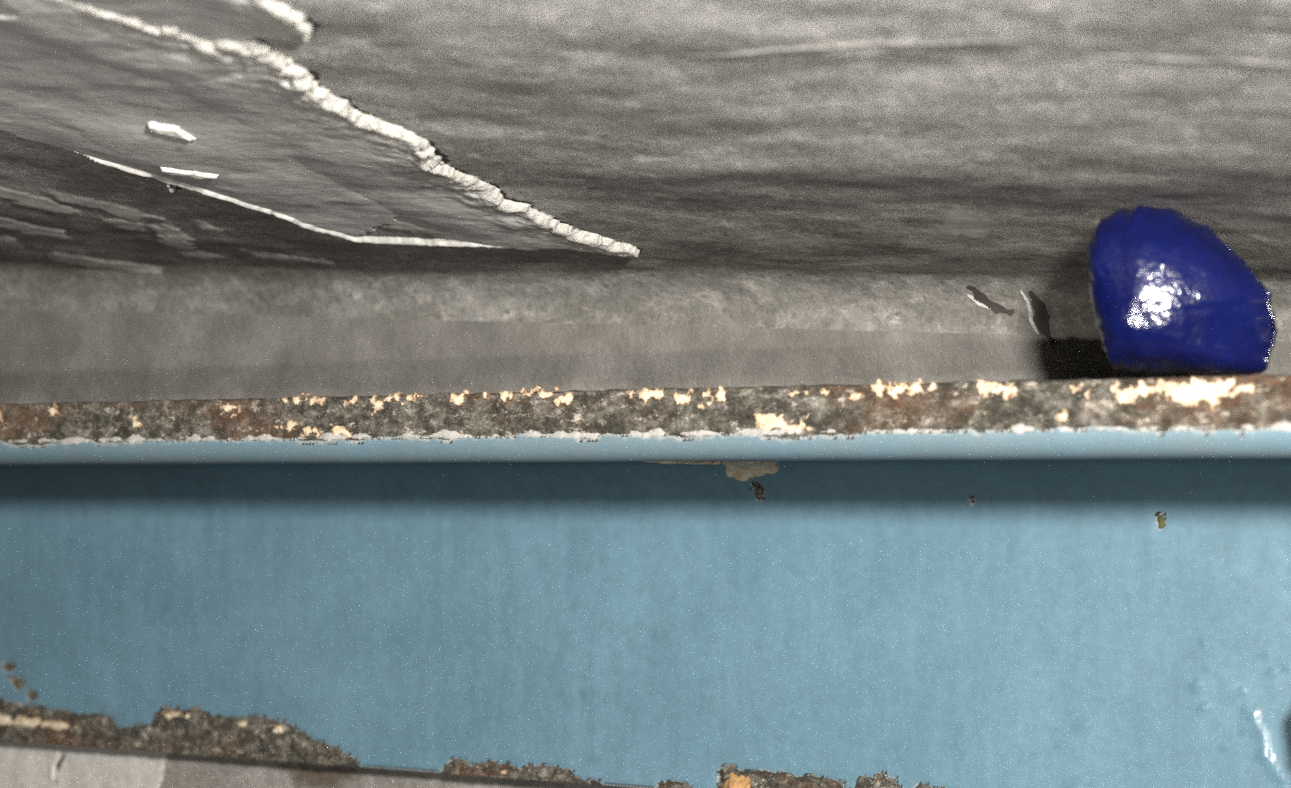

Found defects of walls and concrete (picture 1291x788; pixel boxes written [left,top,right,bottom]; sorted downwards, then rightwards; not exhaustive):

flaking render [0,0,643,259]
peeling [0,218,163,275]
peeling [242,250,334,264]
corrosion [0,699,358,786]
corrosion [448,761,593,784]
corrosion [658,780,693,788]
corrosion [717,764,896,788]